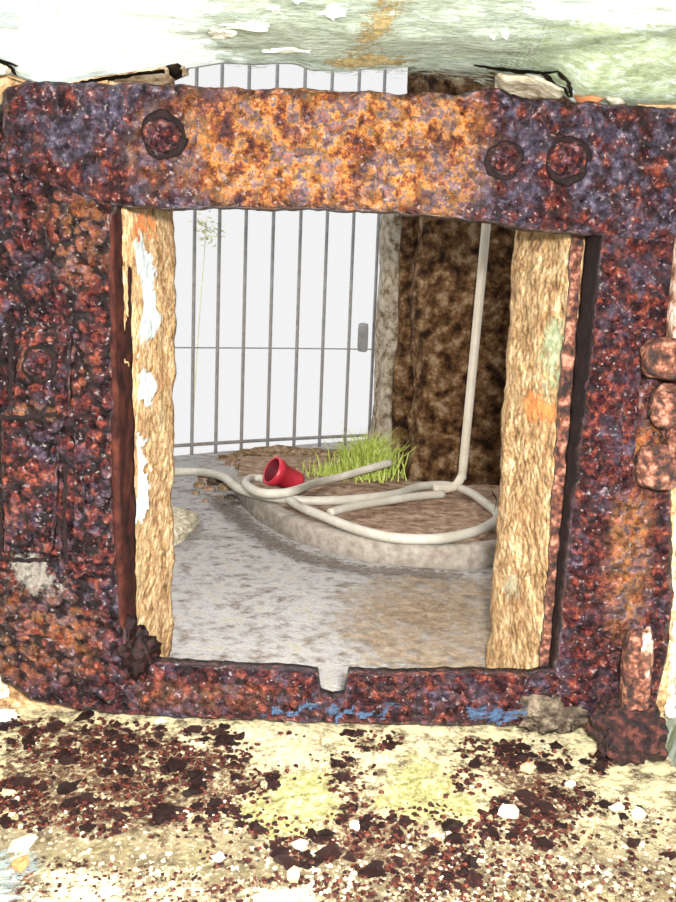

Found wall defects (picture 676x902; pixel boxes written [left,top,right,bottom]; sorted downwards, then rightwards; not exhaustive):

crack [473,64,573,97]